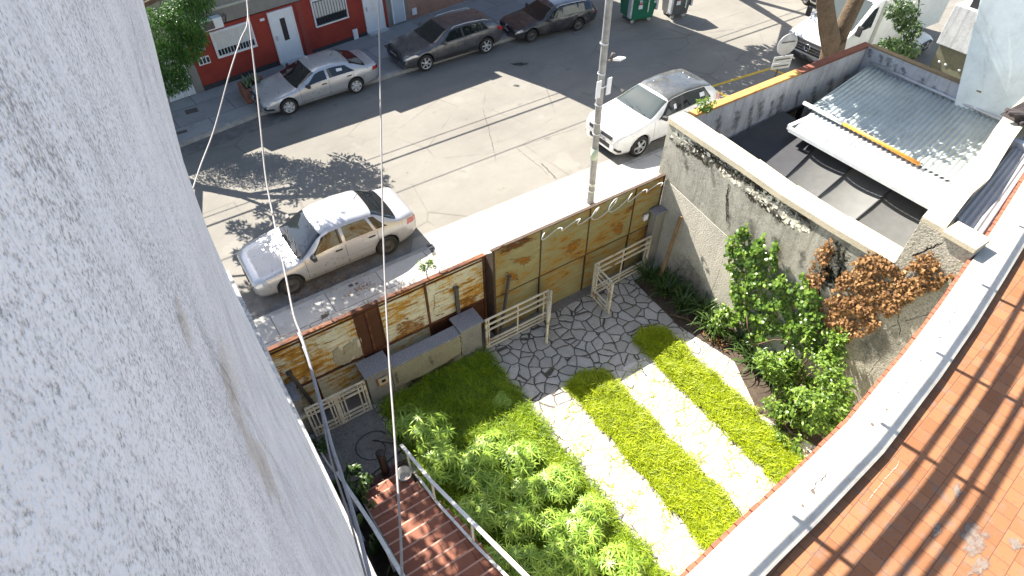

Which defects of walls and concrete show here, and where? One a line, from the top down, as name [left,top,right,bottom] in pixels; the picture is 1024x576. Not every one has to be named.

peeling [669,129,811,234]
corrosion [497,238,532,281]
corrosion [394,288,448,339]